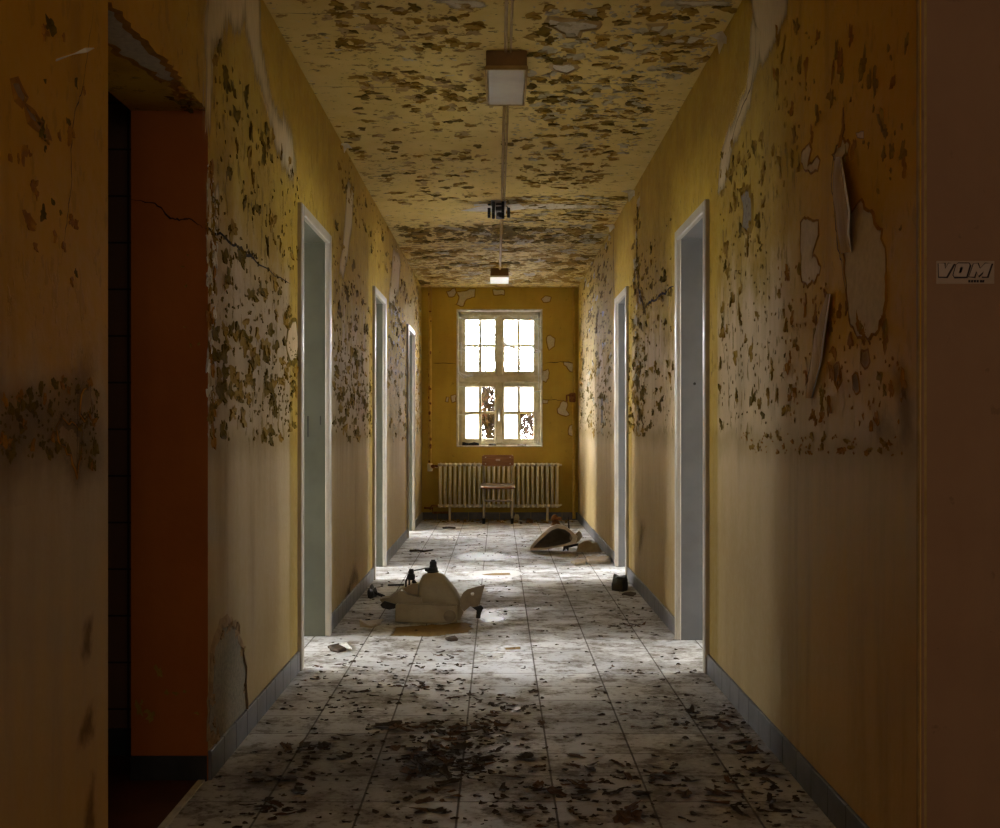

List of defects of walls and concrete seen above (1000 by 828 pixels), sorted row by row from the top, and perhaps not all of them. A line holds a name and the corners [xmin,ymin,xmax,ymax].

peeling [0,375,100,471]
crack [132,199,290,284]
flaking render [205,38,299,450]
flaking render [314,0,737,443]
flaking render [718,18,908,456]
flaking render [206,614,248,745]